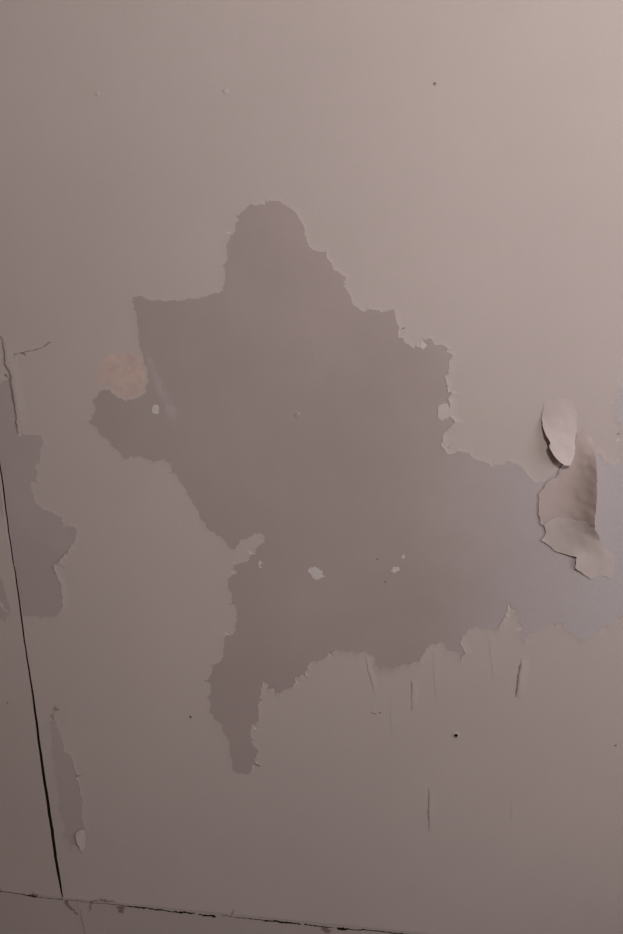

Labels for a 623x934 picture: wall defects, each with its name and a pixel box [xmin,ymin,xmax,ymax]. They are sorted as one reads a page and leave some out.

peeling [83,194,623,779]